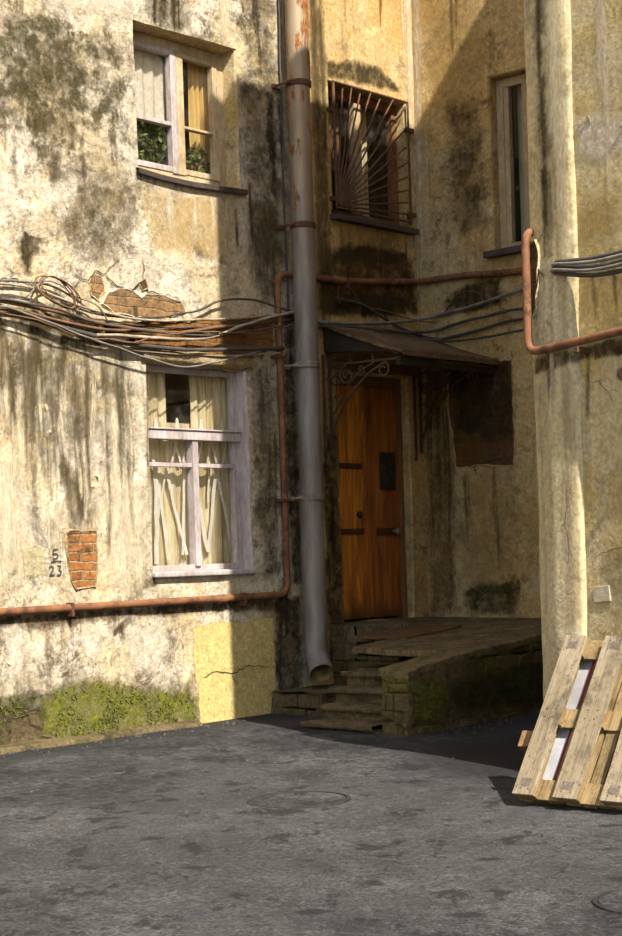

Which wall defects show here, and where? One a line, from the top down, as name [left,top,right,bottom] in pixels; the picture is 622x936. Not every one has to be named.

leakage [149,0,184,29]
leakage [0,0,129,171]
leakage [66,164,135,260]
leakage [243,0,283,298]
leakage [310,0,429,334]
leakage [0,307,156,586]
spalling [88,273,275,358]
leakage [426,361,514,613]
spalling [447,357,517,469]
leakage [534,339,622,383]
spalling [62,527,98,590]
crack [206,665,267,682]